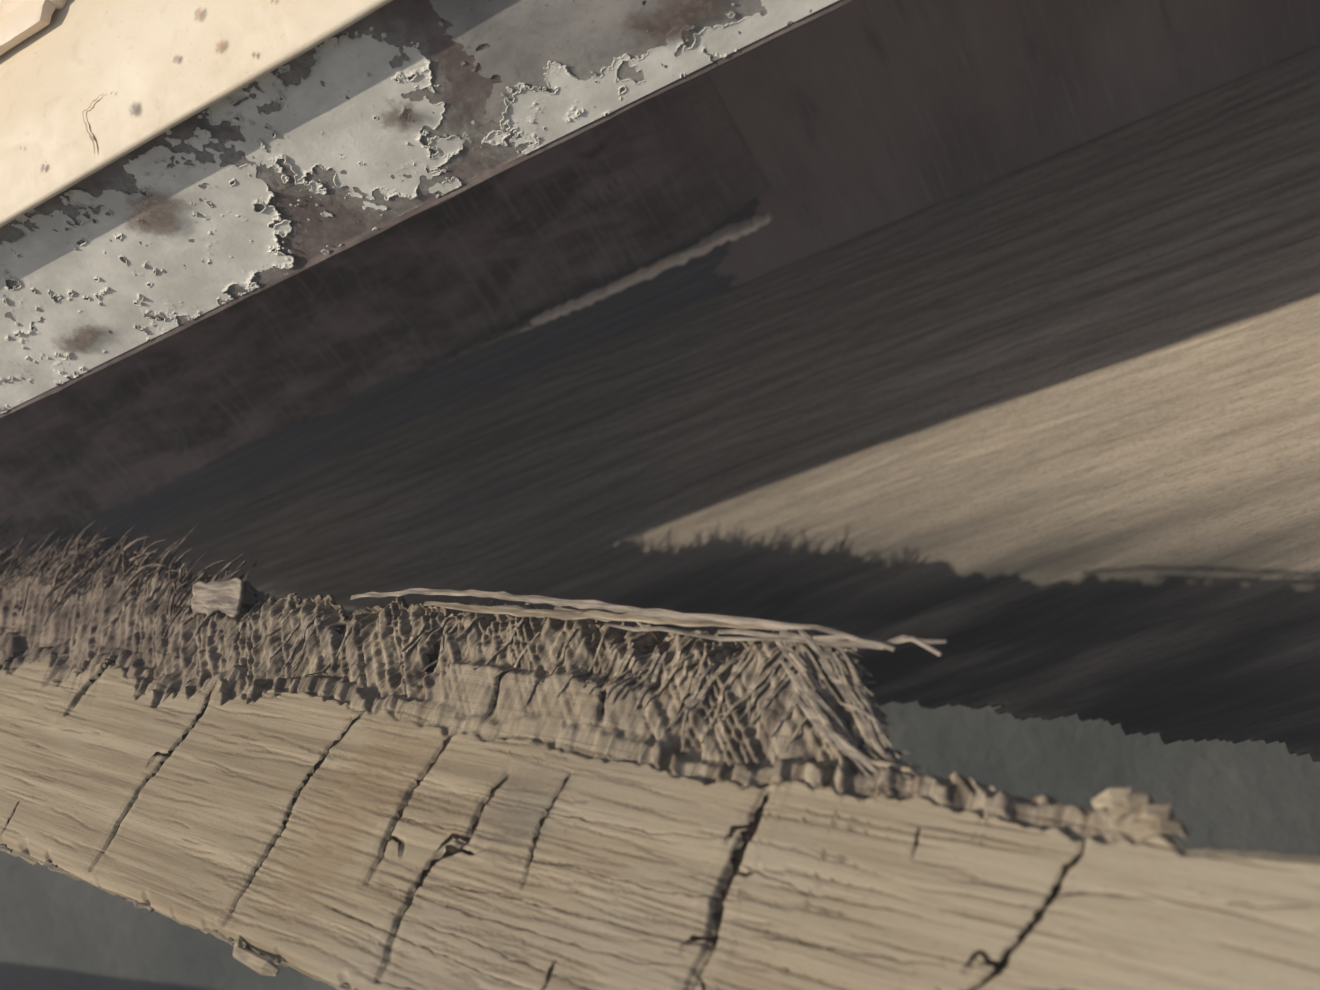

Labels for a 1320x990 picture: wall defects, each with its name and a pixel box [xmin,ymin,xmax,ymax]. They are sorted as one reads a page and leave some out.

peeling [0,0,838,414]
peeling [191,577,244,618]
crack [0,650,26,670]
crack [73,659,116,708]
crack [422,639,441,680]
crack [485,663,514,720]
crack [599,685,607,722]
crack [93,683,216,867]
crack [225,711,364,923]
crack [324,734,920,990]
crack [754,834,1155,990]